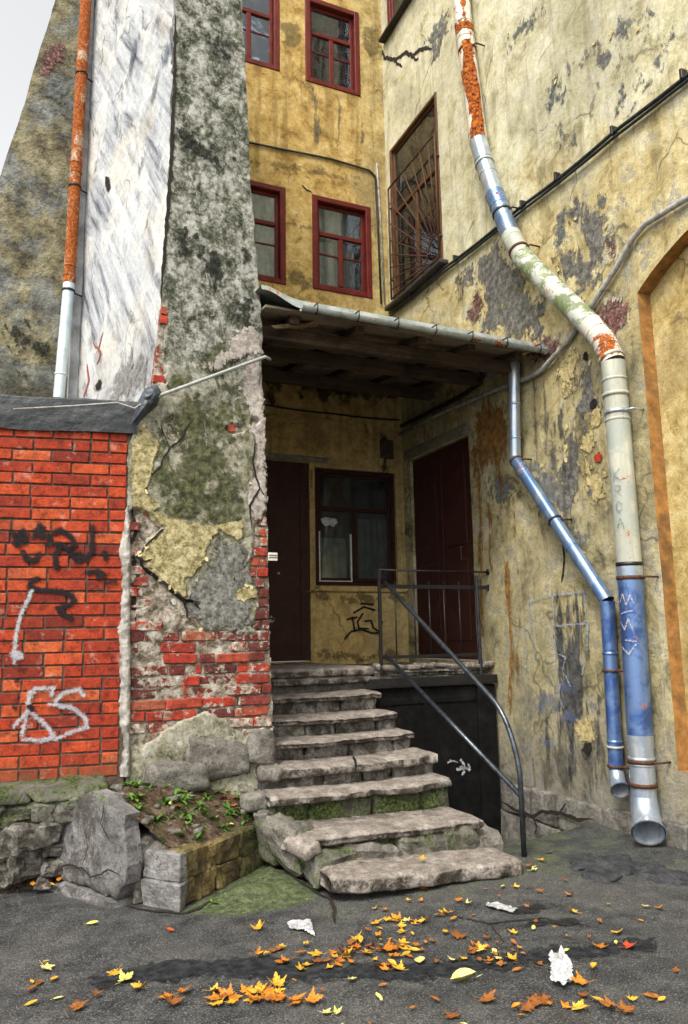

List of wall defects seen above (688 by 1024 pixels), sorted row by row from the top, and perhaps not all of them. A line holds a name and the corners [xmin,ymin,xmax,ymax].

crack [382,46,432,67]
rust [455,0,485,139]
peeling [550,193,633,334]
peeling [451,235,608,553]
spalling [129,324,275,747]
crack [249,442,265,527]
rust [470,398,516,636]
leakage [533,587,606,796]
crack [501,801,594,834]